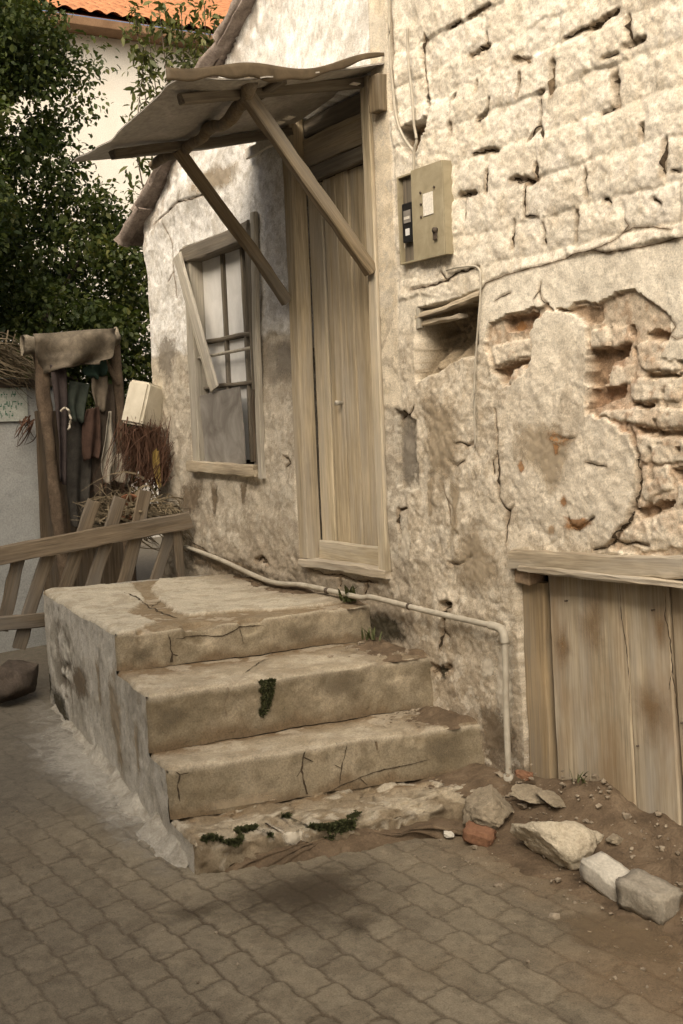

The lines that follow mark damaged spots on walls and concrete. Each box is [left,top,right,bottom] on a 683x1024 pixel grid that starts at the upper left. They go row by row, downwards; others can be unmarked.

peeling [402,424,419,478]
crack [493,450,514,541]
flaking render [483,288,683,556]
crack [572,445,648,551]
crack [124,592,263,662]
crack [297,746,430,796]